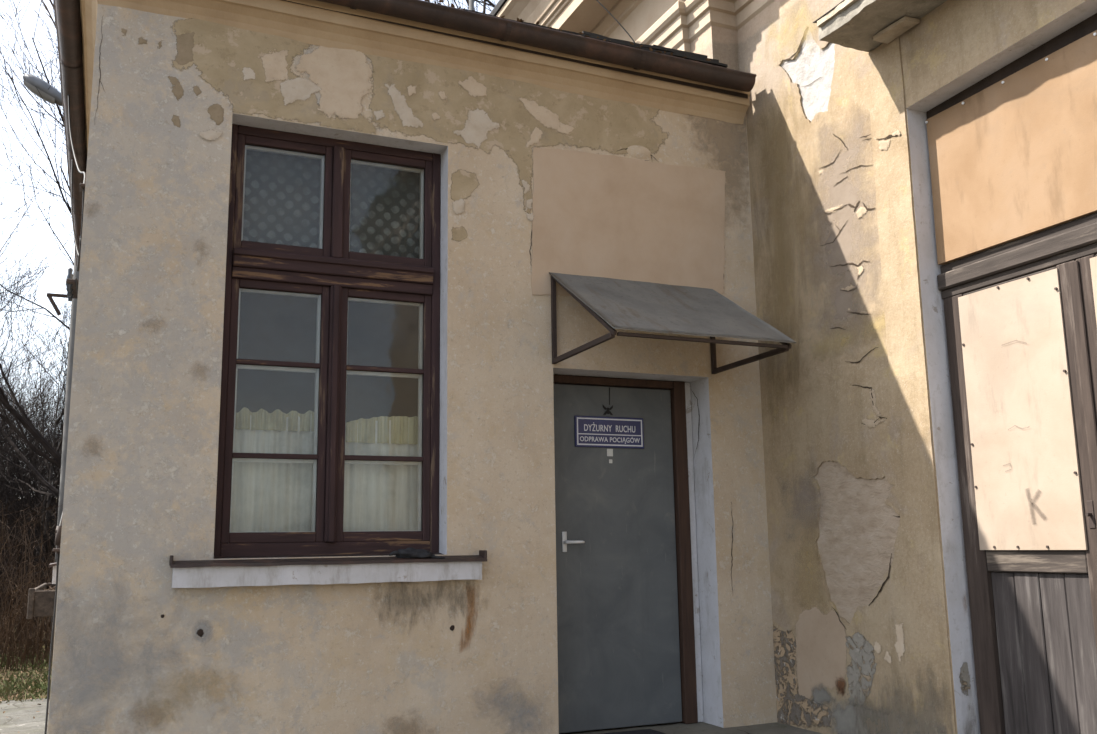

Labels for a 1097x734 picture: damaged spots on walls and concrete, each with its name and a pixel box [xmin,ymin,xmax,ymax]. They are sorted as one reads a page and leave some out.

peeling [168,18,669,221]
flaking render [780,0,858,121]
peeling [451,169,479,241]
crack [818,130,901,330]
crack [845,347,887,428]
corrosion [461,594,475,647]
flaking render [773,626,832,730]
flaking render [814,461,905,705]